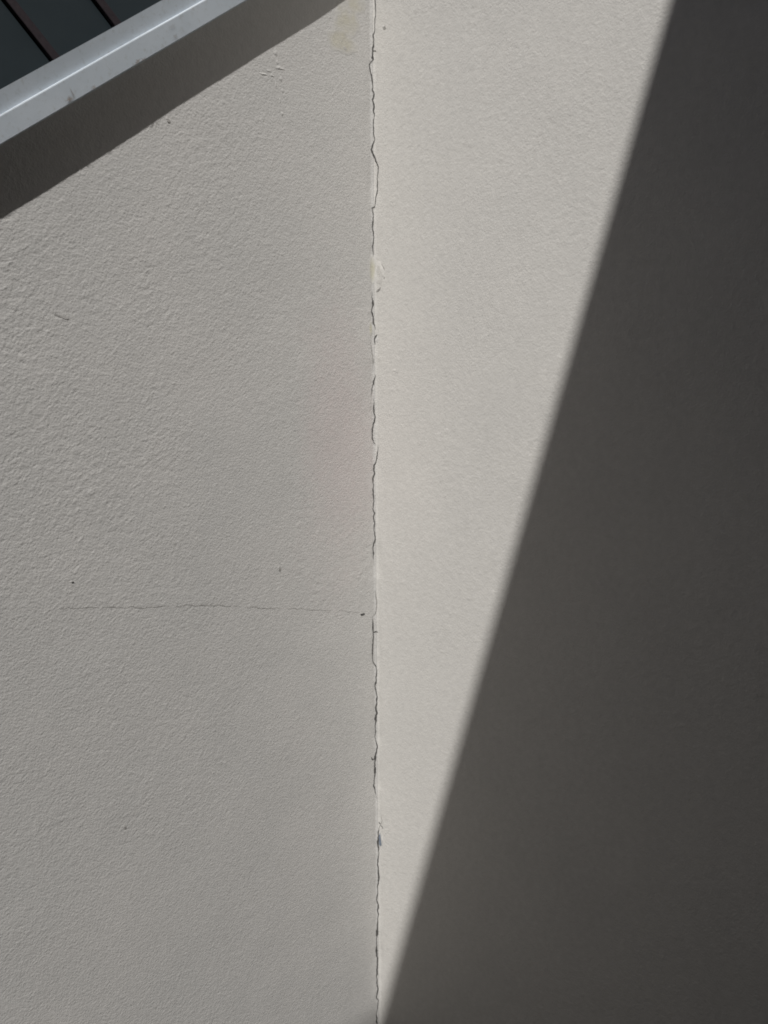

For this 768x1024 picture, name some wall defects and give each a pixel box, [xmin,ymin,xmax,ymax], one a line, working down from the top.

crack [369,1,379,252]
crack [370,298,378,566]
crack [64,591,383,1023]